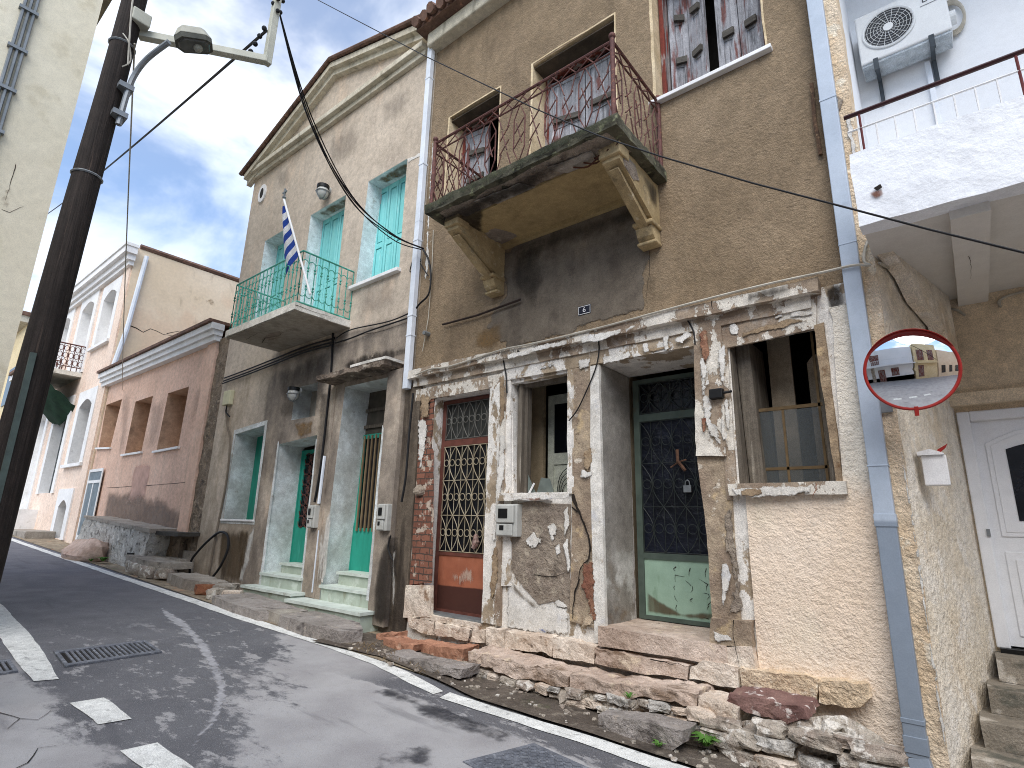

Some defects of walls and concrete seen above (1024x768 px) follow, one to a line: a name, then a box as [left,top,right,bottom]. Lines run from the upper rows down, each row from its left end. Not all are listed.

damp [439,162,562,231]
peeling [580,326,635,343]
peeling [729,310,812,338]
peeling [507,340,567,369]
peeling [603,351,631,364]
damp [105,495,179,528]
flaking render [410,394,434,585]
spalling [489,373,596,635]
peeling [732,485,811,498]
peeling [721,510,743,613]